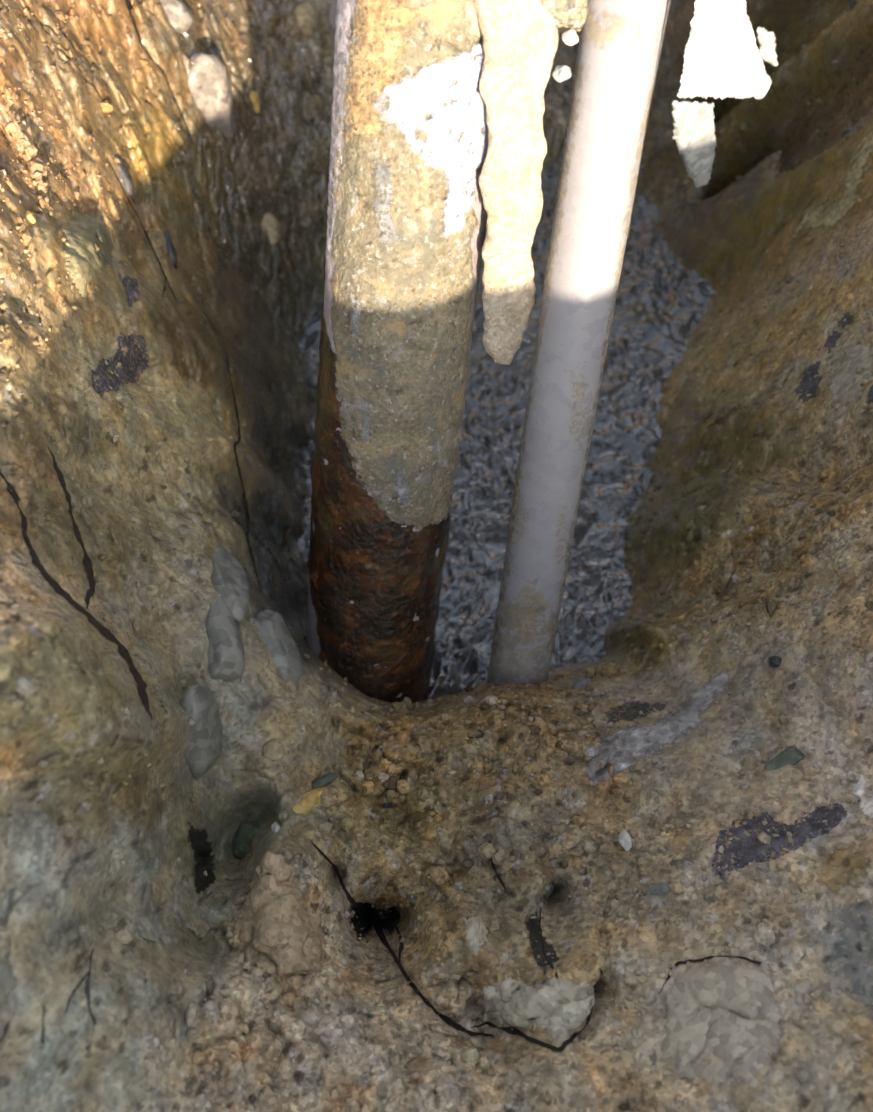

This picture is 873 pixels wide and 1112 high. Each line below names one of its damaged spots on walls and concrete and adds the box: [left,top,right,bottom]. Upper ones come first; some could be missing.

crack [125,0,197,152]
damp [374,162,401,242]
peeling [375,45,489,236]
damp [350,293,360,338]
crack [0,445,152,719]
rust [307,303,450,703]
crack [311,839,593,1052]